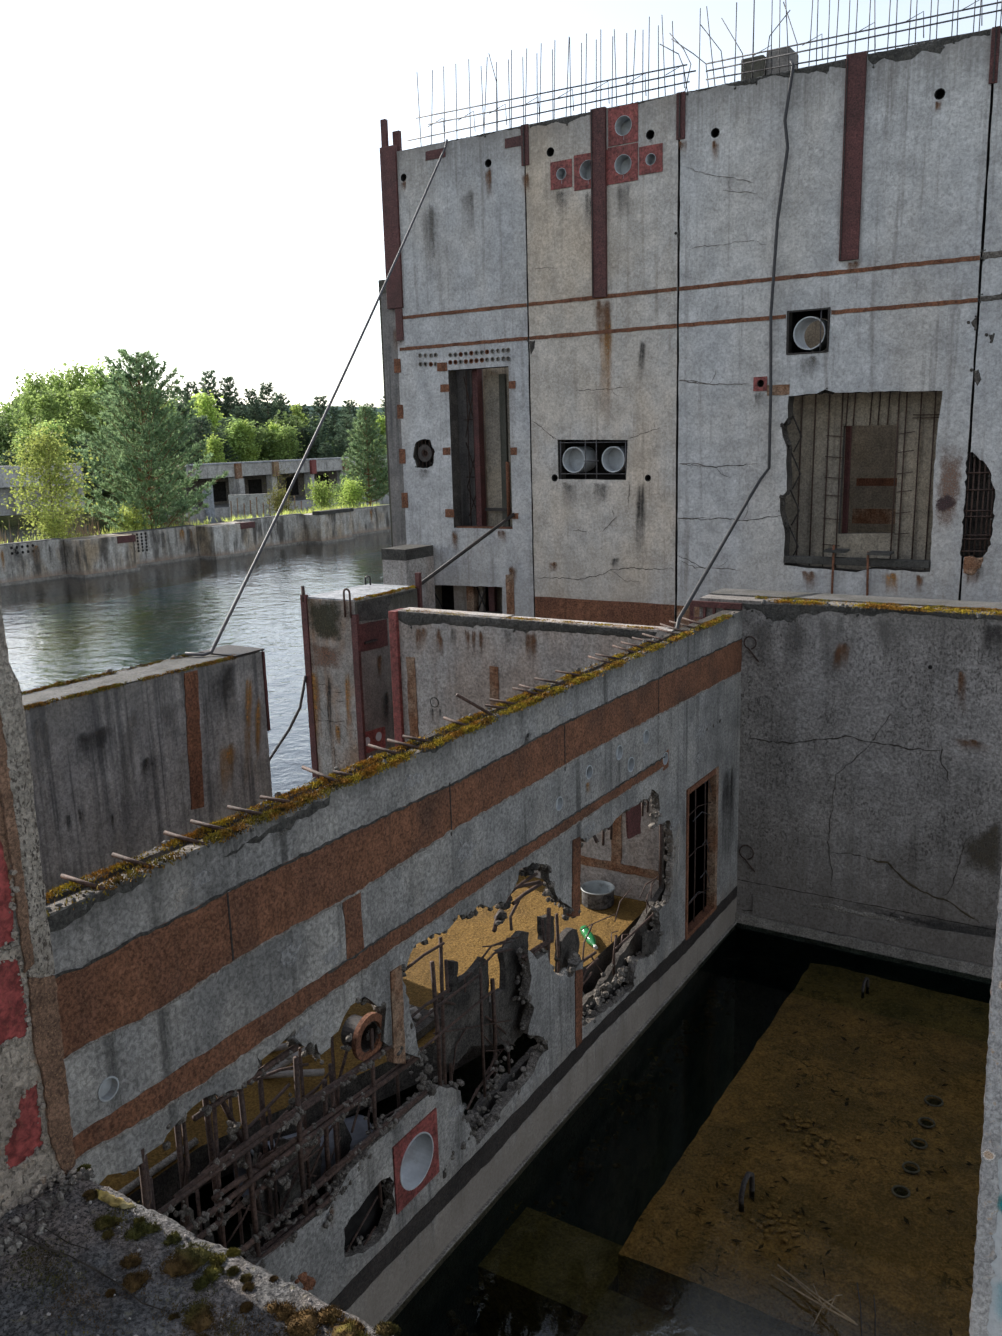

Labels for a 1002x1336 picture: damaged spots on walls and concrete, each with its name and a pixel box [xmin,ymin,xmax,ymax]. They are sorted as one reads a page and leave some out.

peeling [407,0,1002,150]
corrosion [596,301,611,372]
spalling [967,293,1002,343]
spalling [980,249,1002,261]
spalling [559,440,628,479]
spalling [778,388,937,570]
spalling [961,452,996,575]
spalling [63,671,741,1061]
peeling [46,590,1002,979]
crack [753,714,975,940]
spalling [0,756,711,1268]
spalling [969,867,1002,1336]